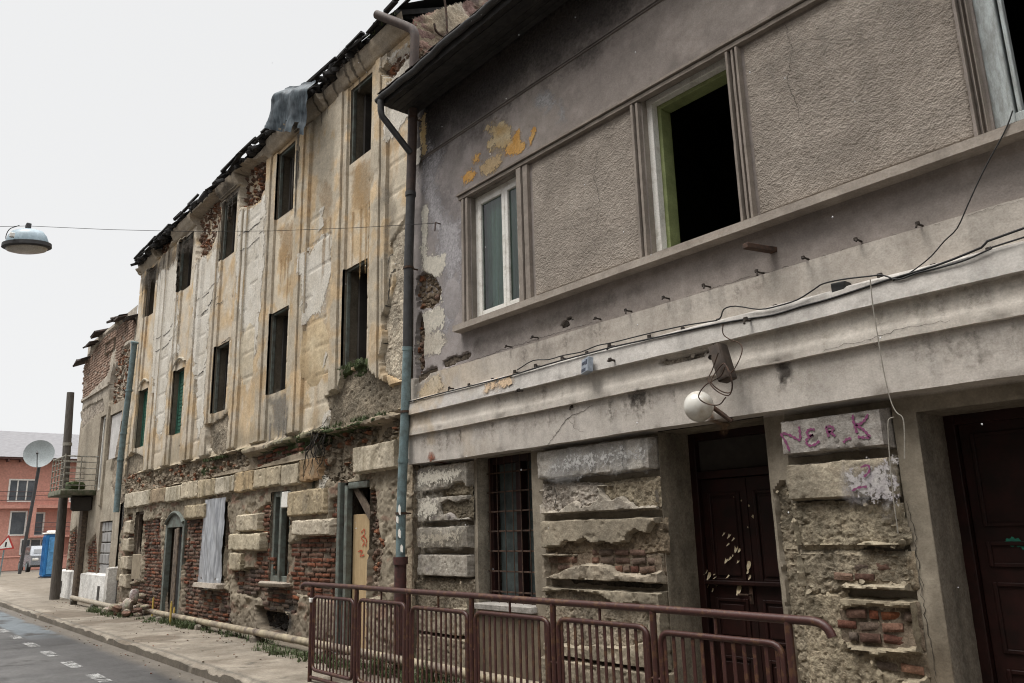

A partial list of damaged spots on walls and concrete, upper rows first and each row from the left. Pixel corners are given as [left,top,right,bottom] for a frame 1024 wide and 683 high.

peeling [463,120,536,184]
flaking render [80,319,136,428]
flaking render [112,159,475,624]
water stain [779,363,791,382]
flaking render [542,443,671,646]
flaking render [776,454,931,683]